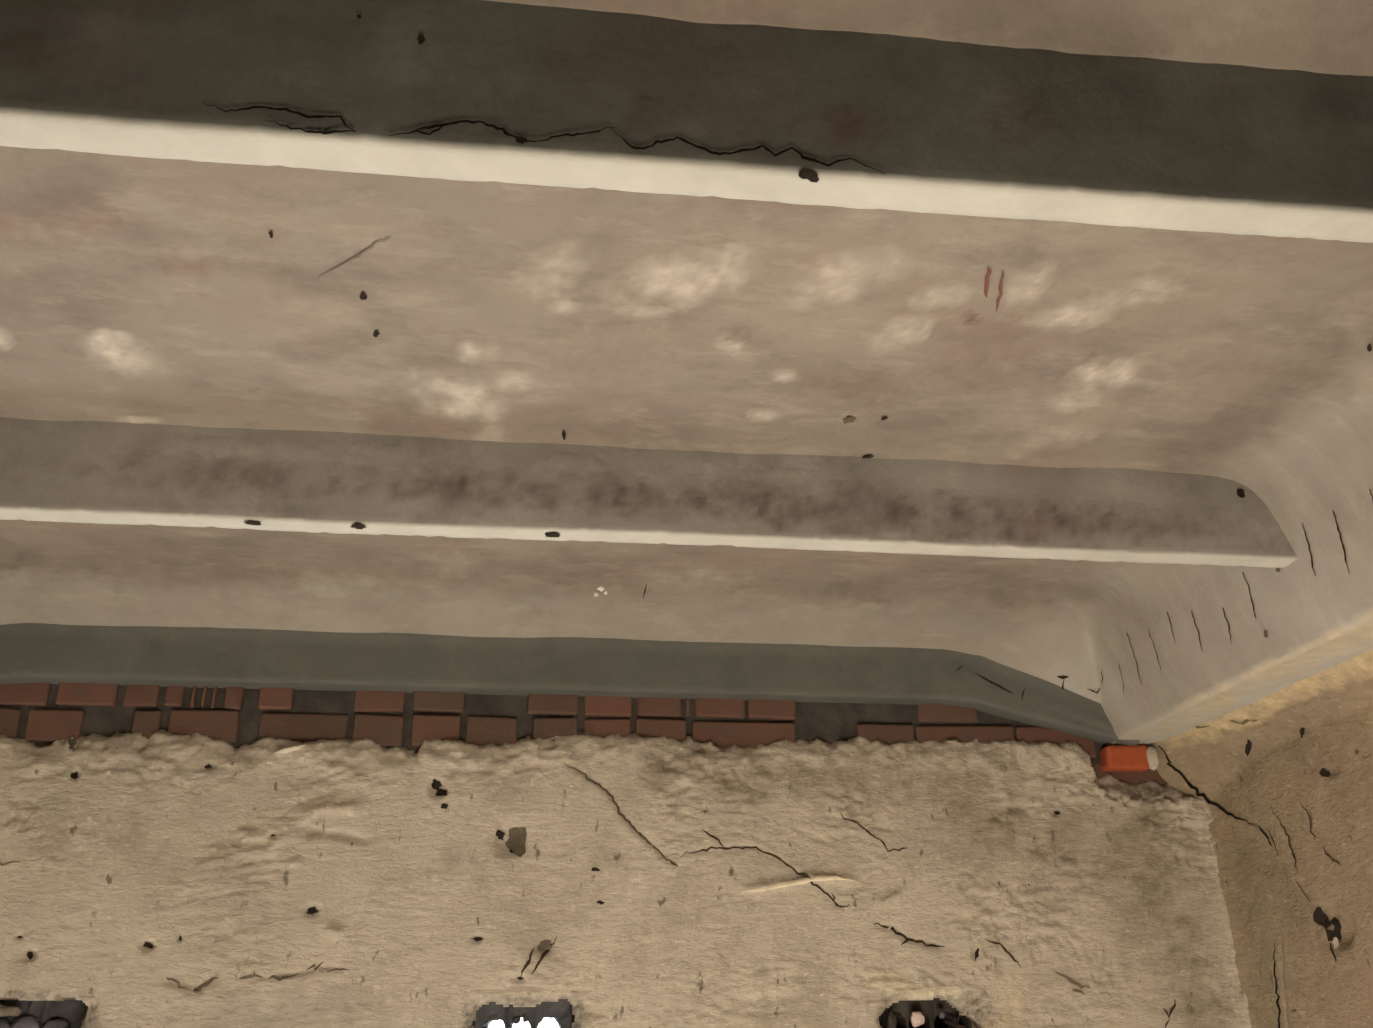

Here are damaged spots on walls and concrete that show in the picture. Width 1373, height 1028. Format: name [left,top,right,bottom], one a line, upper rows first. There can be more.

crack [204,103,356,135]
crack [390,120,885,175]
crack [564,762,945,947]
crack [986,939,1021,967]
crack [1273,942,1281,1028]